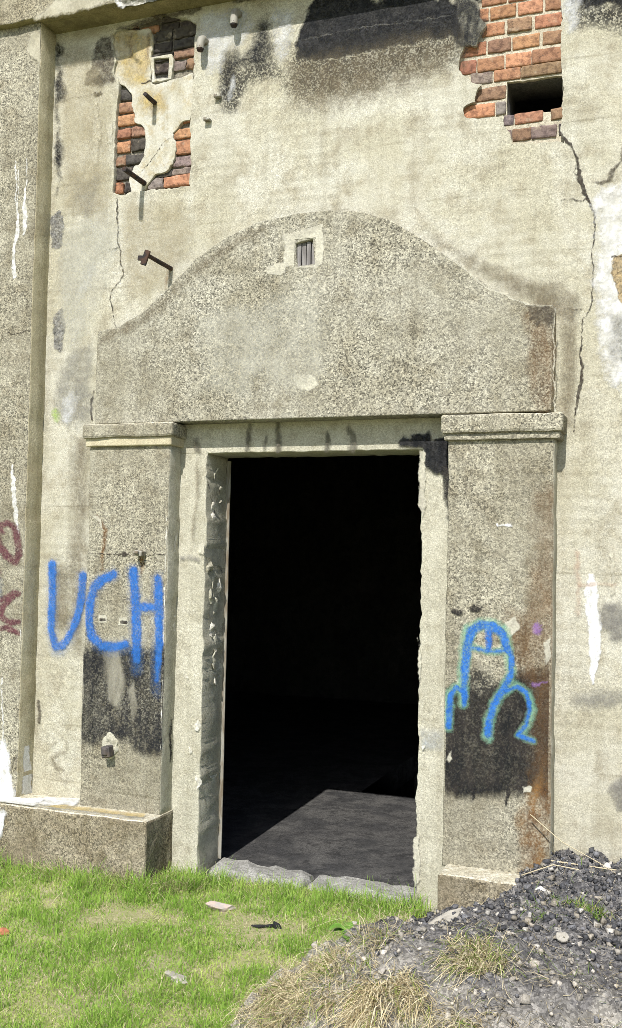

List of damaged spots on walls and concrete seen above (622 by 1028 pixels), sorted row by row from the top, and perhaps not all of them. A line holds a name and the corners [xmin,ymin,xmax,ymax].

spalling [114,0,156,8]
flaking render [91,17,196,195]
water stain [201,0,456,110]
flaking render [459,0,564,144]
crack [109,199,124,317]
crack [558,131,596,432]
water stain [441,468,449,519]
water stain [108,650,136,707]
water stain [453,670,497,715]
corrosion [505,617,520,636]
efflorescence [0,678,79,834]
corrosion [521,777,551,867]